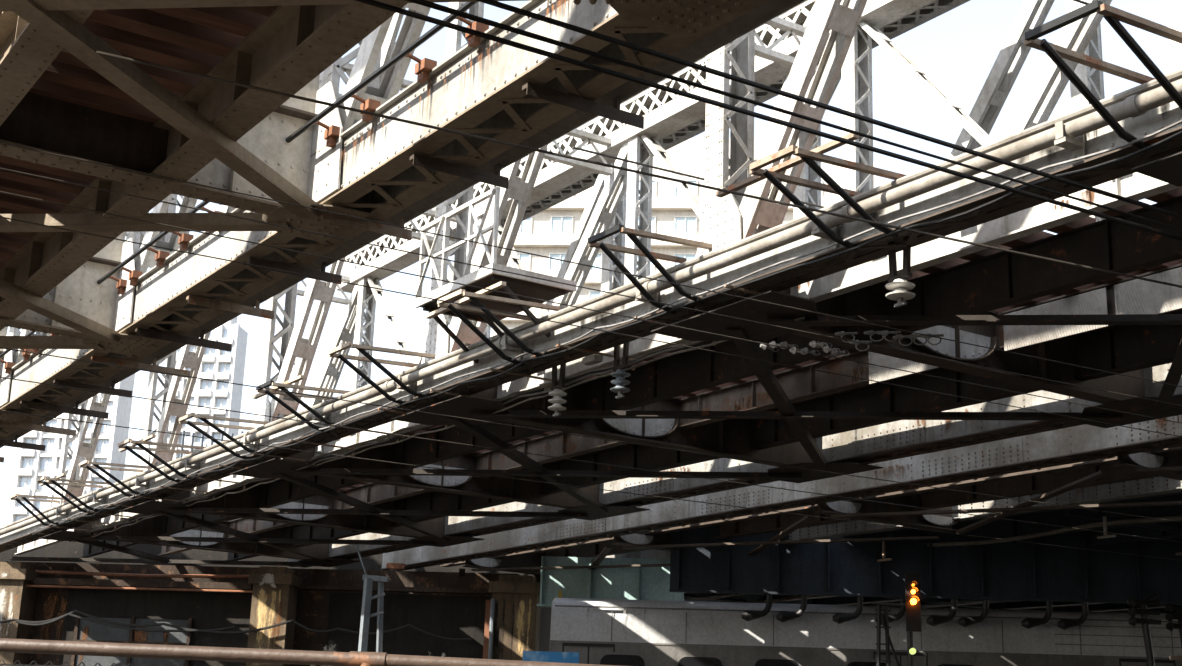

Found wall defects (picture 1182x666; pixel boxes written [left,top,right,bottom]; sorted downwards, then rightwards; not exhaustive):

corrosion [462,36,499,79]